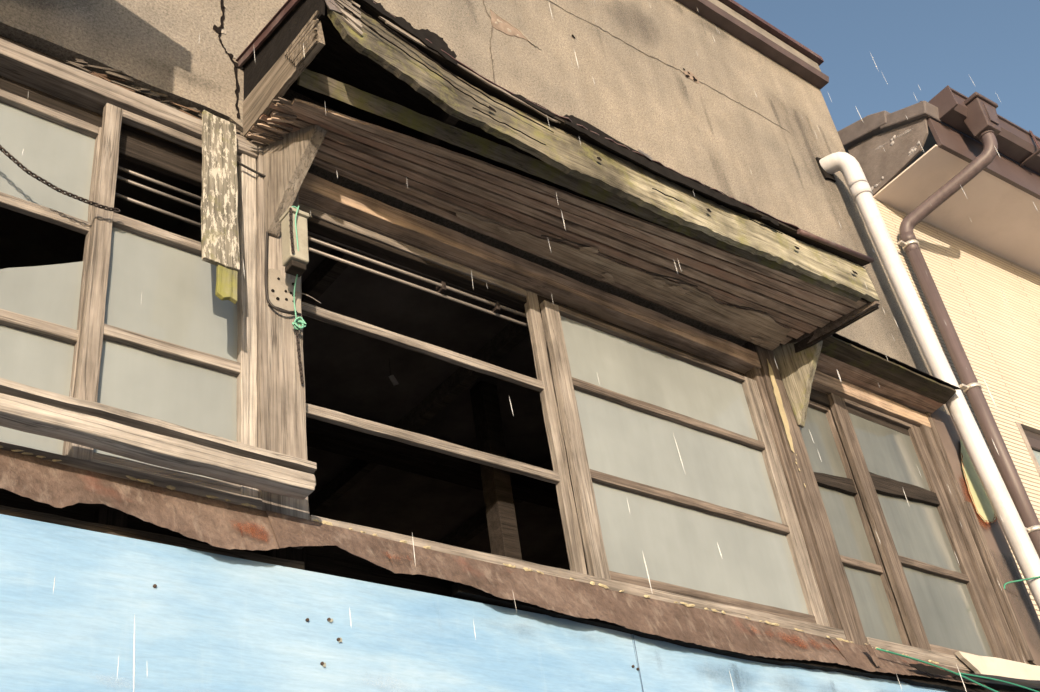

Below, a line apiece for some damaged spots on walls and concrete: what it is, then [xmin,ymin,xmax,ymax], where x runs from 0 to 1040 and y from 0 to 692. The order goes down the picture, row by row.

crack [213,0,243,119]
crack [483,0,541,84]
crack [548,0,790,133]